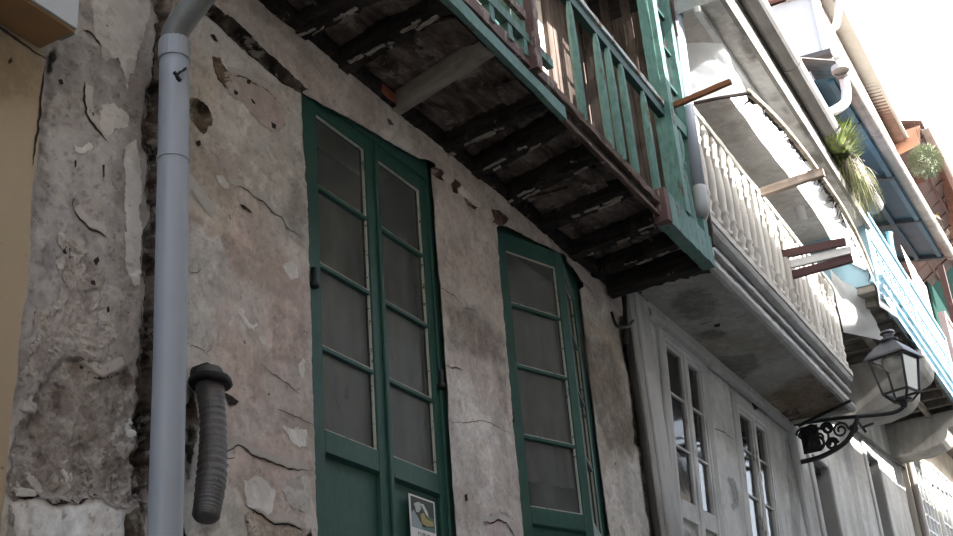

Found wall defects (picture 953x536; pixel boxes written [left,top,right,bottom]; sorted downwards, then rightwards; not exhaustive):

peeling [90,0,152,89]
spalling [205,4,309,94]
peeling [99,103,129,136]
spalling [189,97,213,135]
peeling [212,56,286,133]
peeling [123,139,143,286]
spalling [6,231,146,536]
crack [227,436,309,471]
peeling [244,475,312,536]